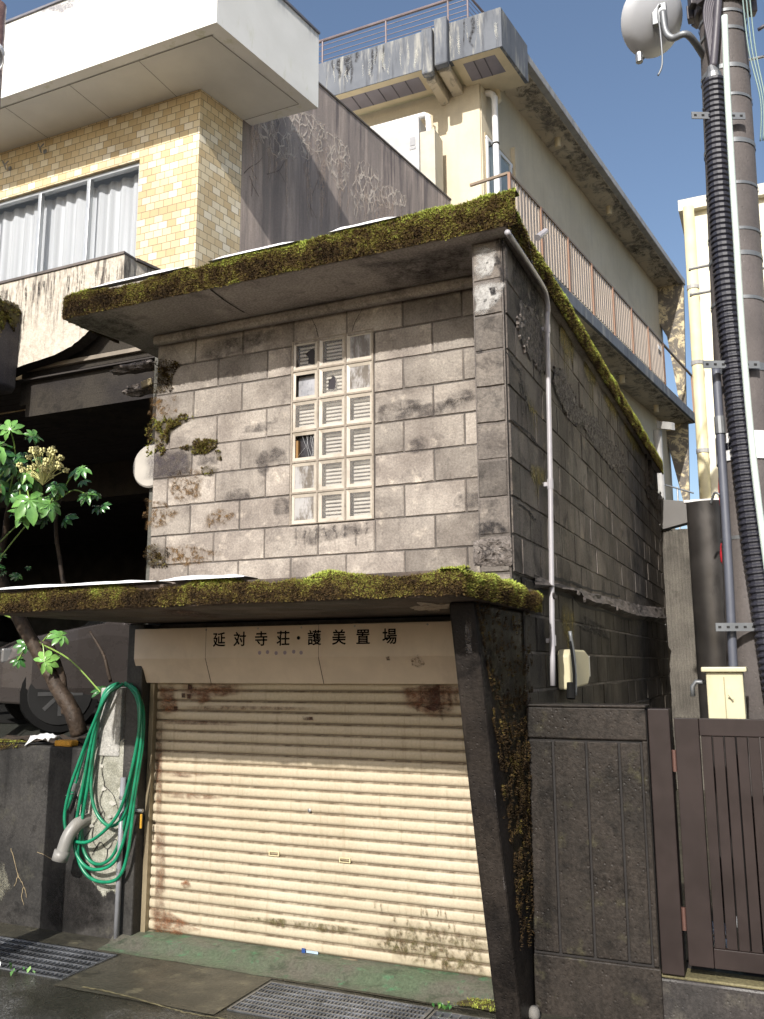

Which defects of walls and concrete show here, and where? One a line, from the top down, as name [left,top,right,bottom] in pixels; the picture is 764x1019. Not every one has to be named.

spalling [110,360,155,397]
water stain [148,452,189,477]
corrosion [160,683,233,711]
corrosion [405,684,458,713]
corrosion [154,910,184,933]